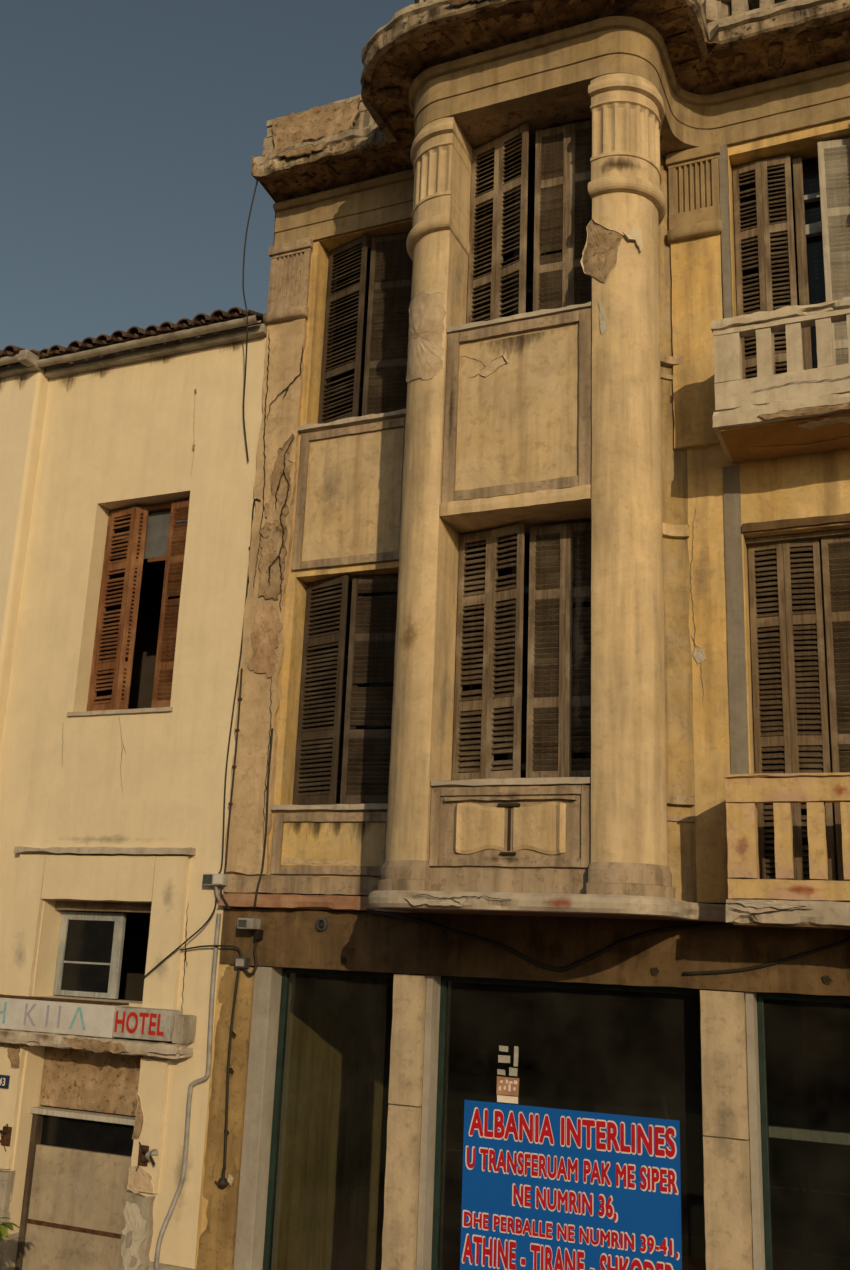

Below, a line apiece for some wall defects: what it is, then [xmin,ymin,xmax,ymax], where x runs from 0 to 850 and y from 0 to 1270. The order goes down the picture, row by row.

peeling [580,219,643,283]
crack [253,335,303,611]
peeling [121,1165,154,1270]